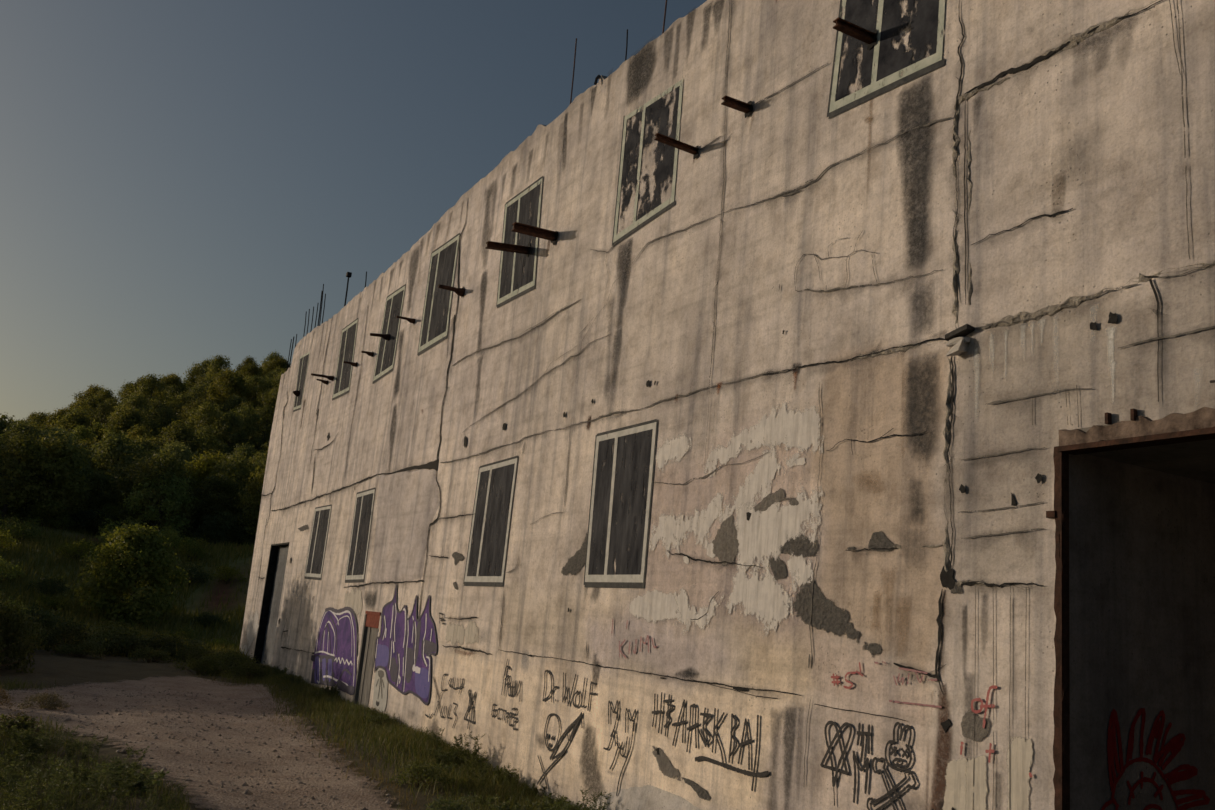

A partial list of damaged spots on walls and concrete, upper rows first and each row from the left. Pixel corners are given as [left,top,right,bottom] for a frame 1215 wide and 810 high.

damp [627,0,724,102]
damp [899,79,931,265]
damp [618,241,632,305]
crack [253,0,1215,810]
damp [907,362,935,458]
peeling [629,402,882,658]
spalling [847,531,894,551]